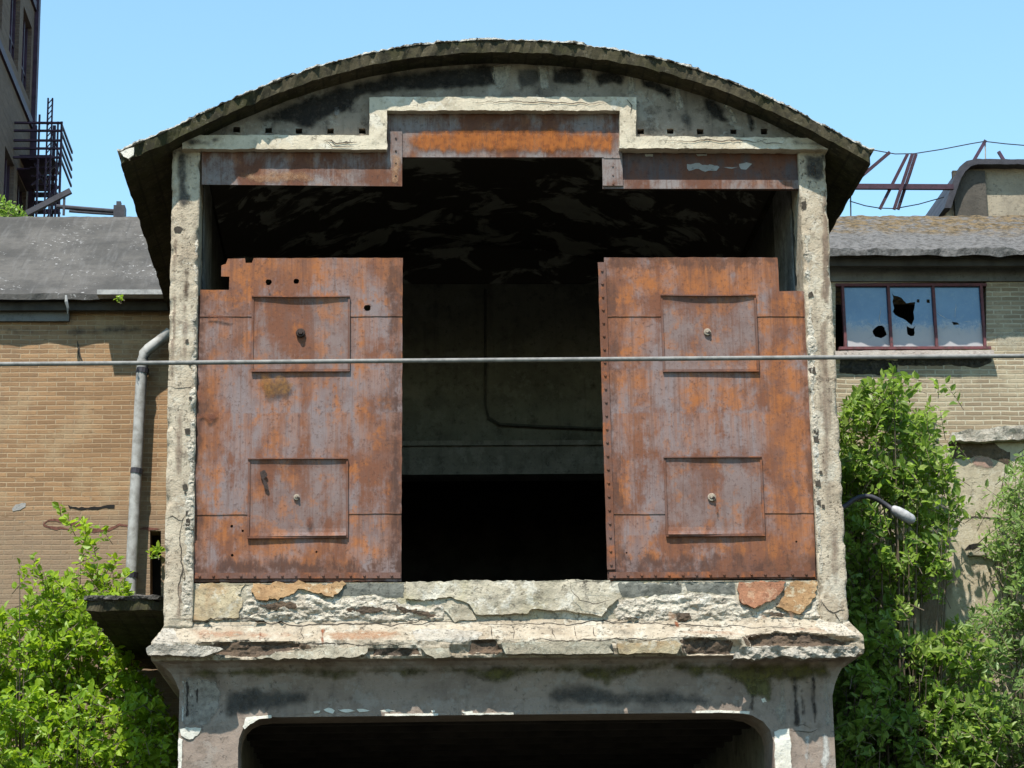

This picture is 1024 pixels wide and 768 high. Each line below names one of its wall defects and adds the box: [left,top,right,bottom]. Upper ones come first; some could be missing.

damp [492,65,511,89]
rust [410,130,612,152]
peeling [687,154,751,172]
rust [261,377,290,397]
crack [43,515,845,646]
spalling [152,628,180,645]